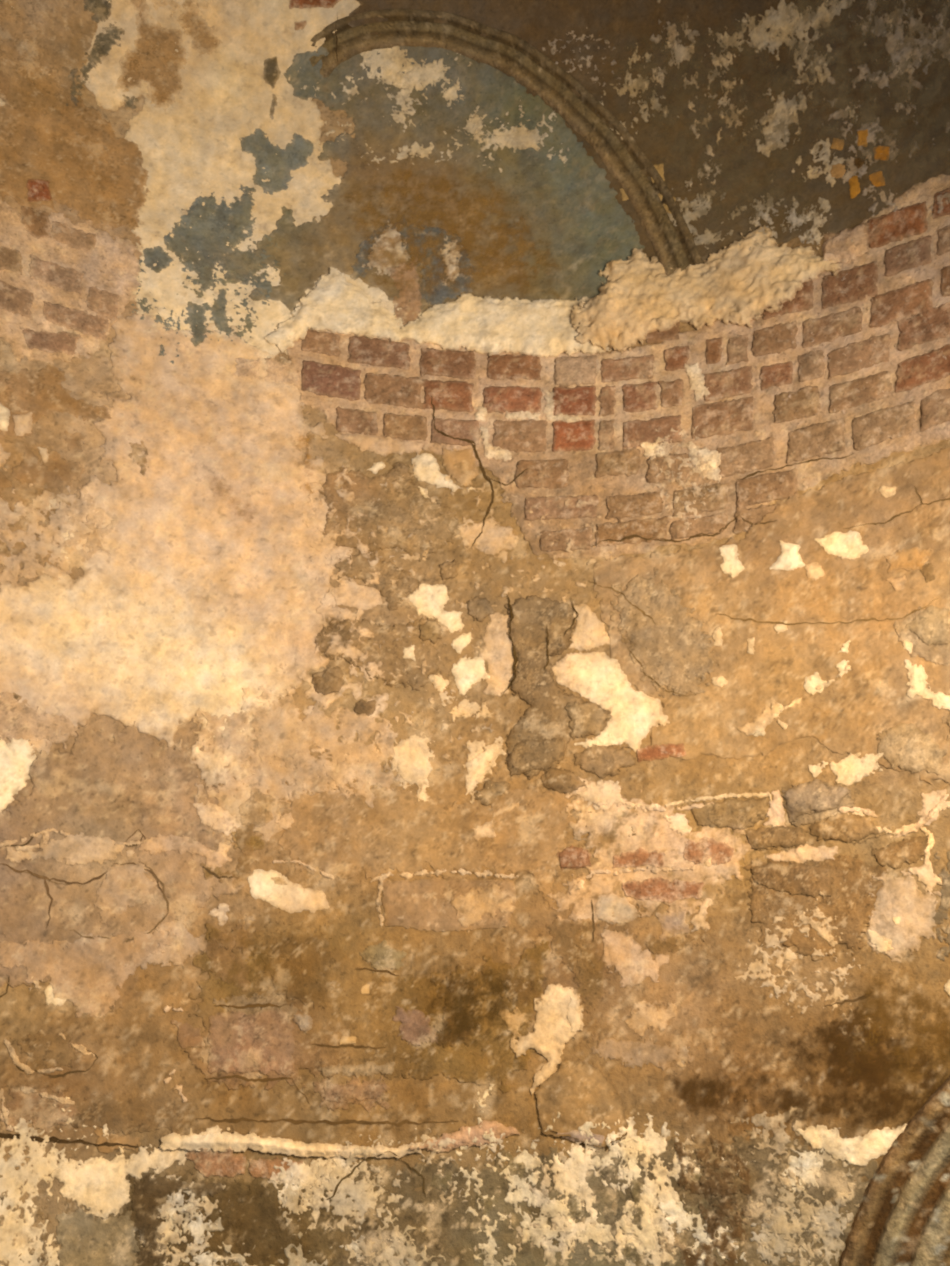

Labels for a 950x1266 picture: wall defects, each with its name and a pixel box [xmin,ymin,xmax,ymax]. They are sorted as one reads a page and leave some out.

flaking render [0,0,950,955]
crack [430,395,529,548]
crack [591,514,777,547]
crack [843,486,950,529]
crack [503,581,656,695]
crack [718,598,938,625]
crack [3,829,169,943]
crack [216,1002,289,1010]
crack [198,1075,459,1200]
crack [311,1042,386,1050]
damp [675,1080,730,1111]
damp [774,982,950,1123]